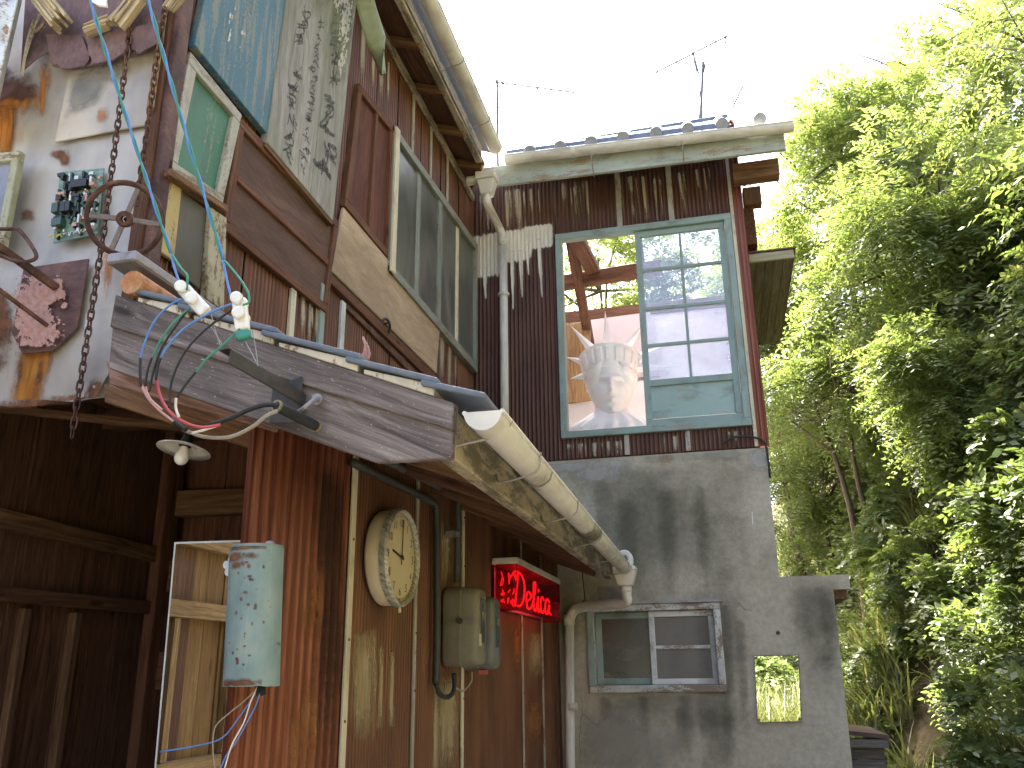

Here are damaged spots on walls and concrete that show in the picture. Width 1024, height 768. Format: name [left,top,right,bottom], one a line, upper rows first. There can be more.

corrosion [0,67,50,153]
peeling [13,274,67,347]
corrosion [1,352,101,407]
corrosion [230,546,265,665]